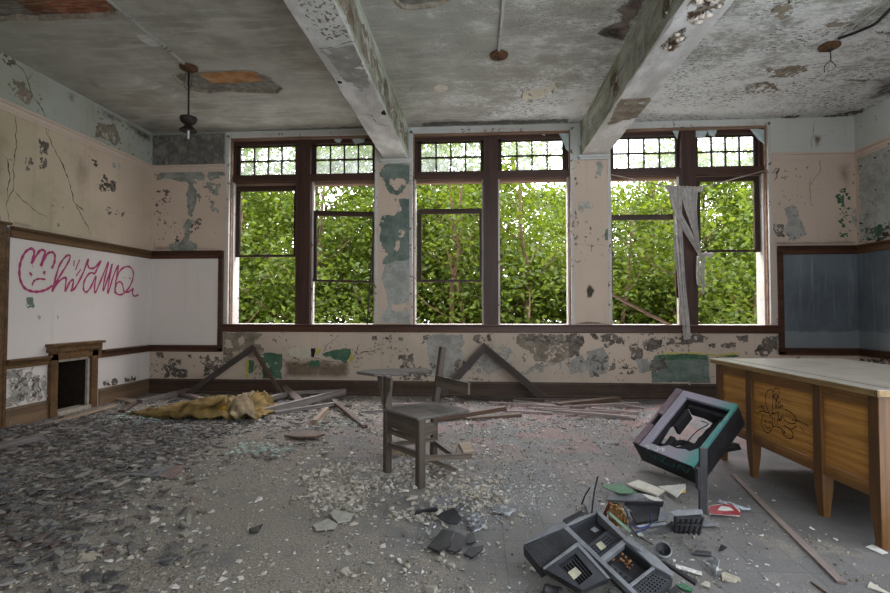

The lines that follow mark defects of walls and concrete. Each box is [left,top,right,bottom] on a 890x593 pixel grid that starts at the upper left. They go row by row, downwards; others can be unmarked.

spalling [0,0,119,22]
crack [4,118,48,226]
crack [12,58,90,233]
peeling [154,171,225,251]
spalling [171,70,284,94]
flaking render [298,0,409,150]
flaking render [607,97,651,125]
peeling [745,65,808,94]
peeling [836,143,890,242]
peeling [372,164,659,380]
flaking render [6,367,48,407]
peeling [156,332,264,378]